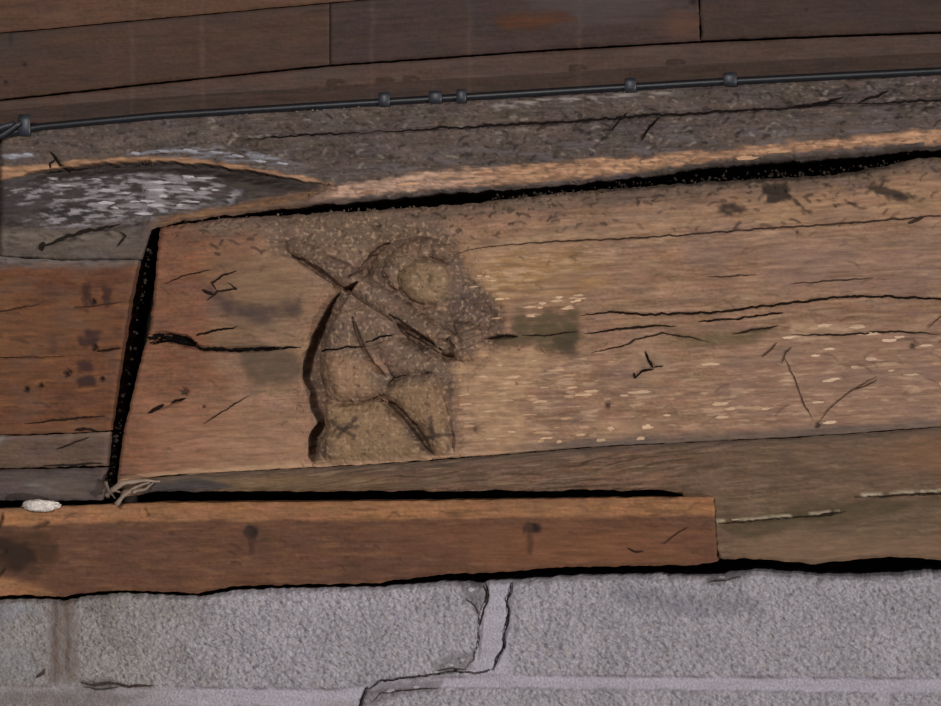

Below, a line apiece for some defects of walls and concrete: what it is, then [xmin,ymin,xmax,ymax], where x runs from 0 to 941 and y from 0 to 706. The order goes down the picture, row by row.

crack [452,215,941,255]
crack [147,326,395,353]
crack [487,278,941,423]